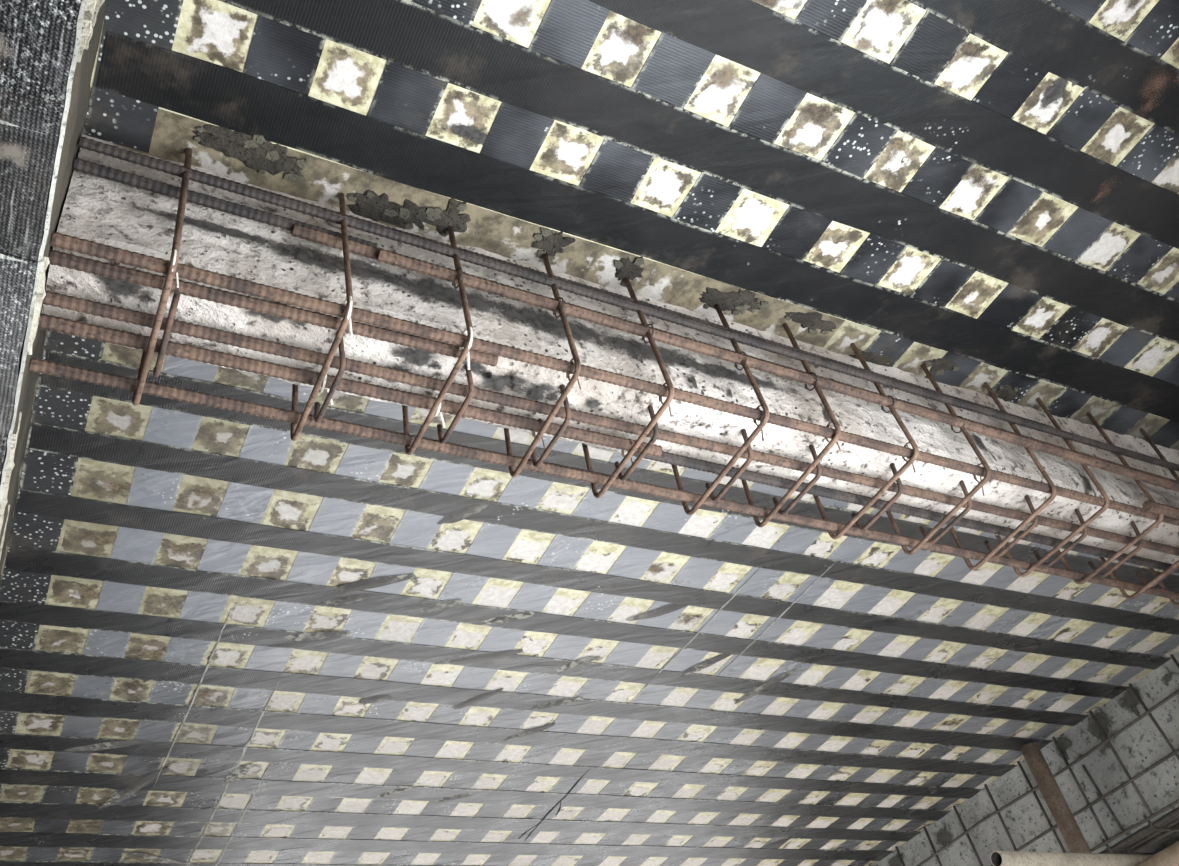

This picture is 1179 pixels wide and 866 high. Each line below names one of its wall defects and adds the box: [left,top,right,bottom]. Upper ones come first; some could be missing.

spalling [192,124,308,181]
spalling [346,189,471,237]
spalling [531,227,575,261]
spalling [614,256,644,287]
damp [132,205,797,403]
spalling [698,287,769,315]
spalling [784,312,836,336]
spalling [849,349,894,367]
spalling [922,358,959,375]
spalling [990,385,1019,402]